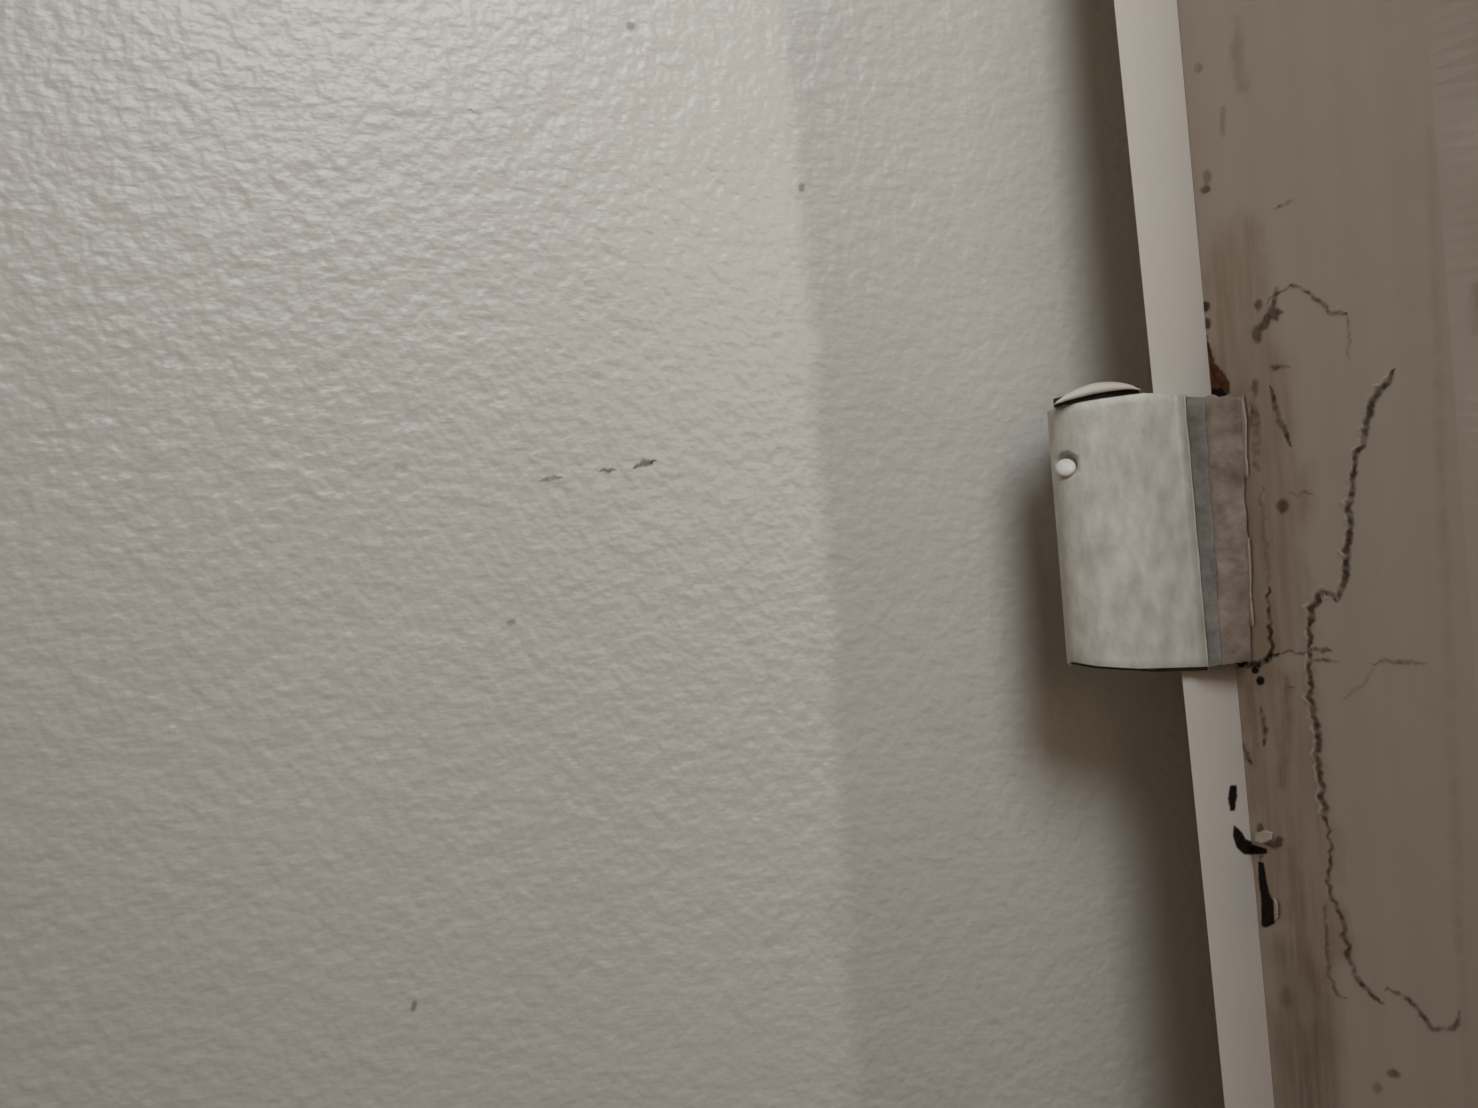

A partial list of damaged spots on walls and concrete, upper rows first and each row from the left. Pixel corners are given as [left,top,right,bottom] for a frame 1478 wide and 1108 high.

spalling [1228,785,1282,927]
crack [1236,368,1456,1028]